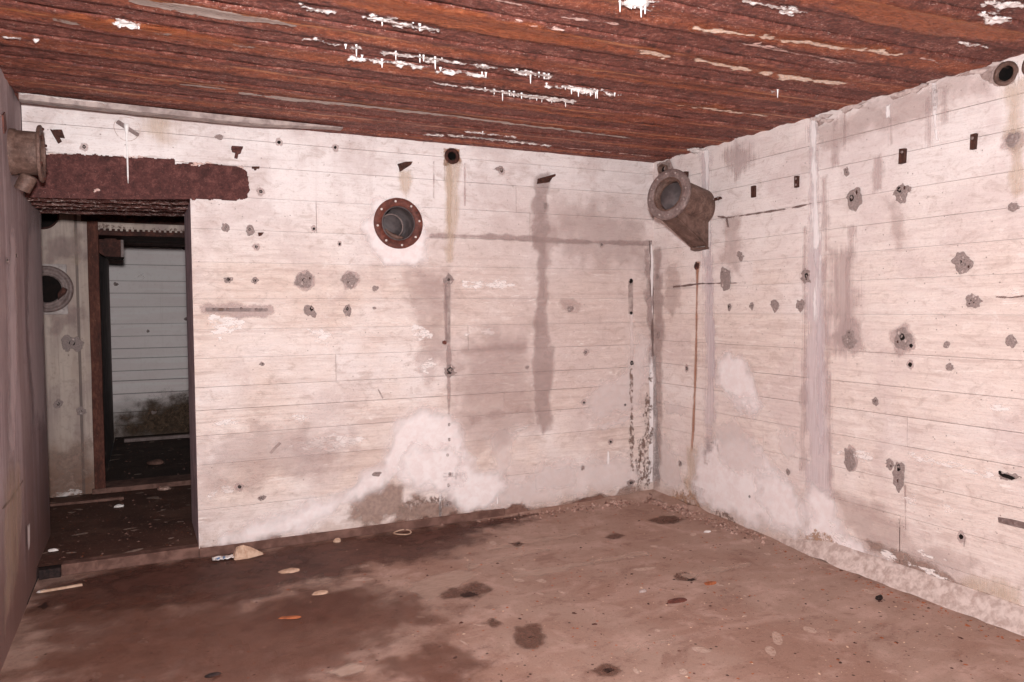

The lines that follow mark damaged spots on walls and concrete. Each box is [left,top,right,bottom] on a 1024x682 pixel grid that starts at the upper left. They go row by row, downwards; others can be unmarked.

spalling [846,187,862,211]
spalling [893,183,912,203]
spalling [951,252,974,274]
corrosion [691,262,700,450]
spalling [891,324,915,369]
damp [37,120,958,682]
spalling [831,445,873,471]
peeling [885,451,1022,505]